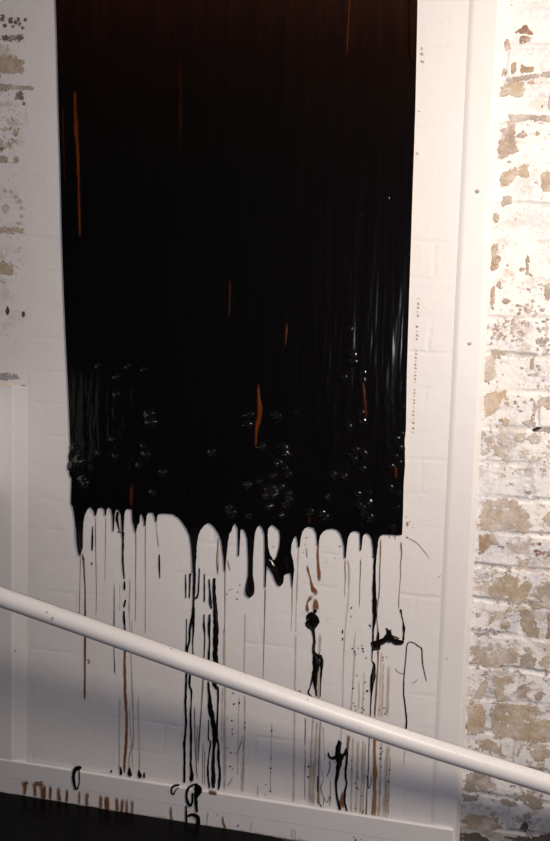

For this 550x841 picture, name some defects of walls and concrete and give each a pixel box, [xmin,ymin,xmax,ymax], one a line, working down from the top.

peeling [0,14,27,42]
peeling [504,25,534,51]
peeling [0,52,34,105]
peeling [493,96,550,224]
peeling [0,188,25,235]
peeling [490,243,502,271]
peeling [484,255,550,383]
peeling [481,389,550,472]
peeling [478,497,550,559]
peeling [467,574,550,764]
peeling [462,772,499,802]
peeling [460,790,550,841]